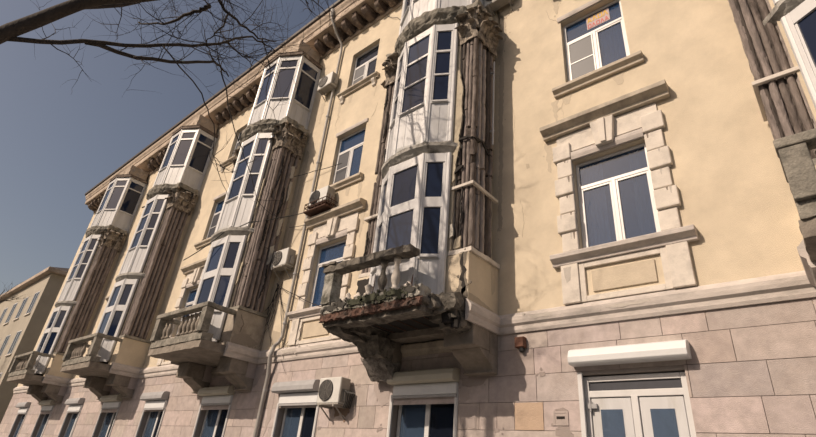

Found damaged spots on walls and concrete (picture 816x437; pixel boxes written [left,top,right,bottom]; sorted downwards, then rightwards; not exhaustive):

crack [454,135,492,294]
spalling [322,323,367,346]
spalling [371,224,472,335]